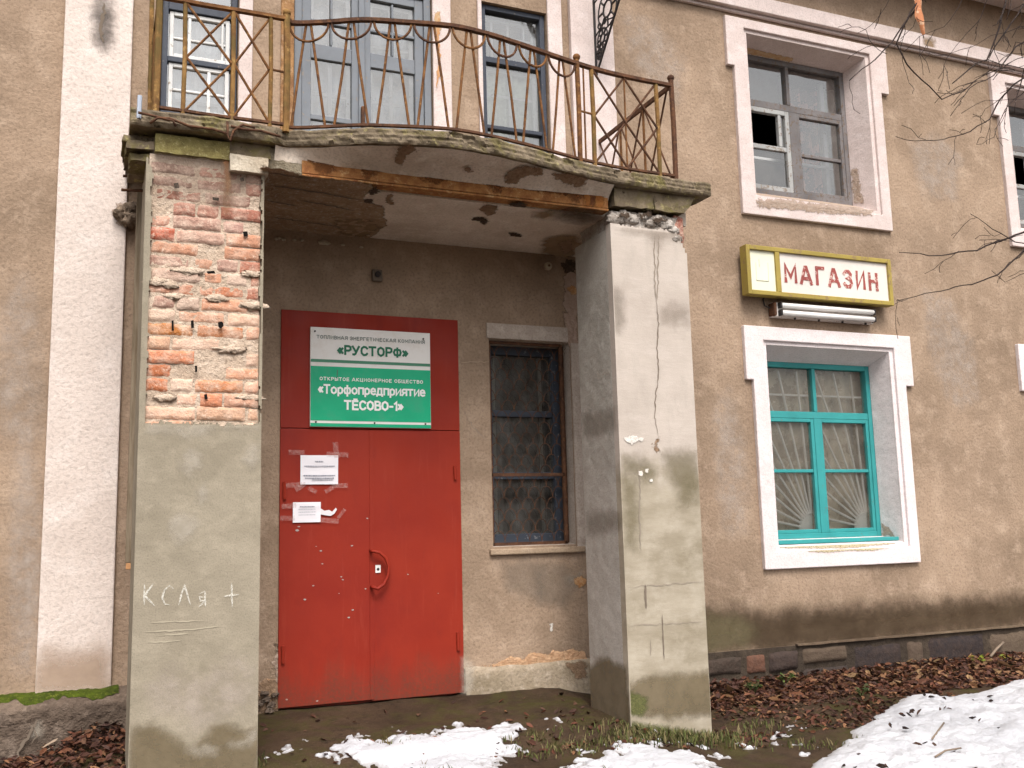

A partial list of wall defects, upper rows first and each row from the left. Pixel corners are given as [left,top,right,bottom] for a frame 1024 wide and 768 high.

corrosion [308,160,334,175]
peeling [395,144,419,165]
corrosion [486,184,604,208]
peeling [504,165,588,187]
peeling [756,168,874,216]
peeling [471,202,527,225]
spalling [580,210,684,244]
flaking render [142,162,394,425]
crack [638,234,660,549]
damp [706,598,1024,648]
flaking render [489,649,588,679]
damp [590,659,711,735]